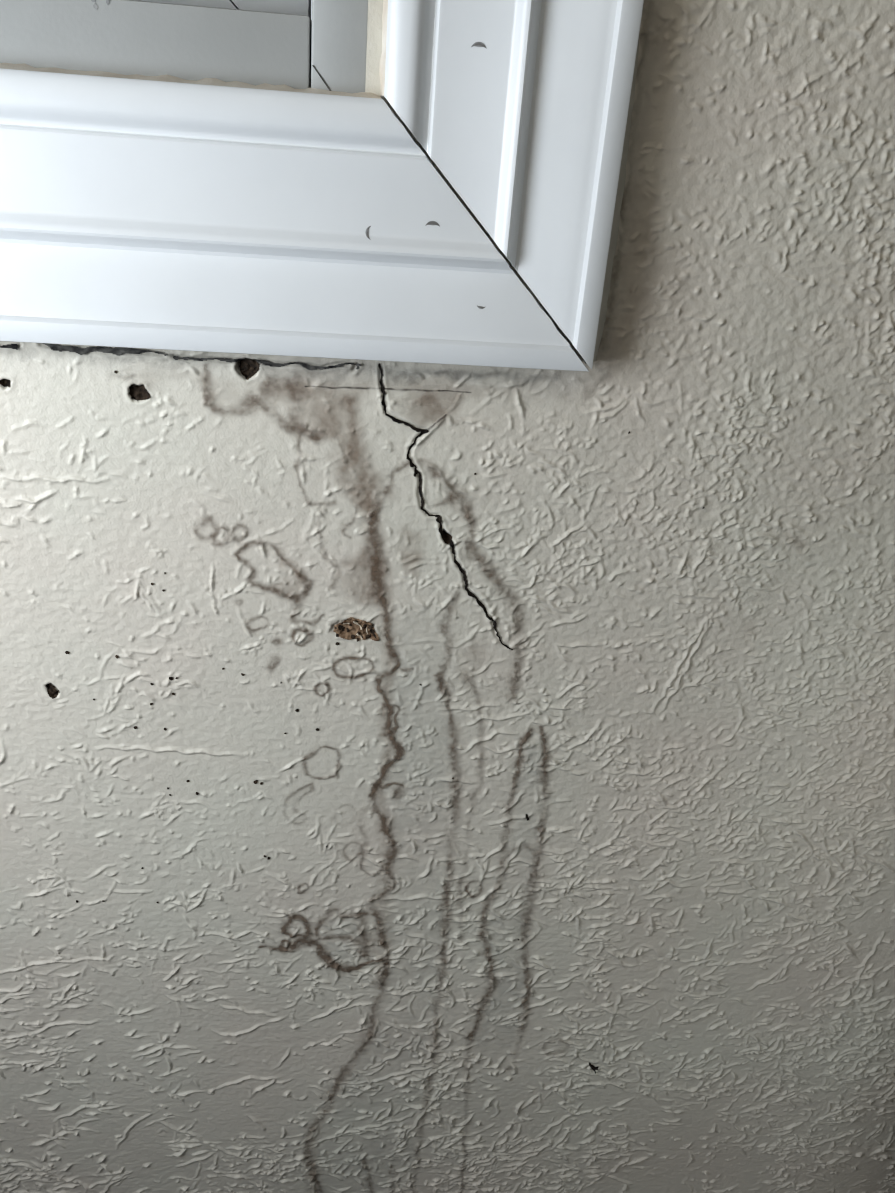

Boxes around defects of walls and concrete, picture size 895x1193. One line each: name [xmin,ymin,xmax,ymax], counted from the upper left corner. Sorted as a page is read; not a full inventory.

crack [0,343,513,650]
damp [235,542,306,618]
damp [285,425,319,440]
peeling [333,617,379,645]
damp [358,476,407,797]
damp [448,485,509,595]
damp [436,672,458,804]
damp [507,726,549,810]
damp [258,811,396,977]
damp [466,889,497,1040]